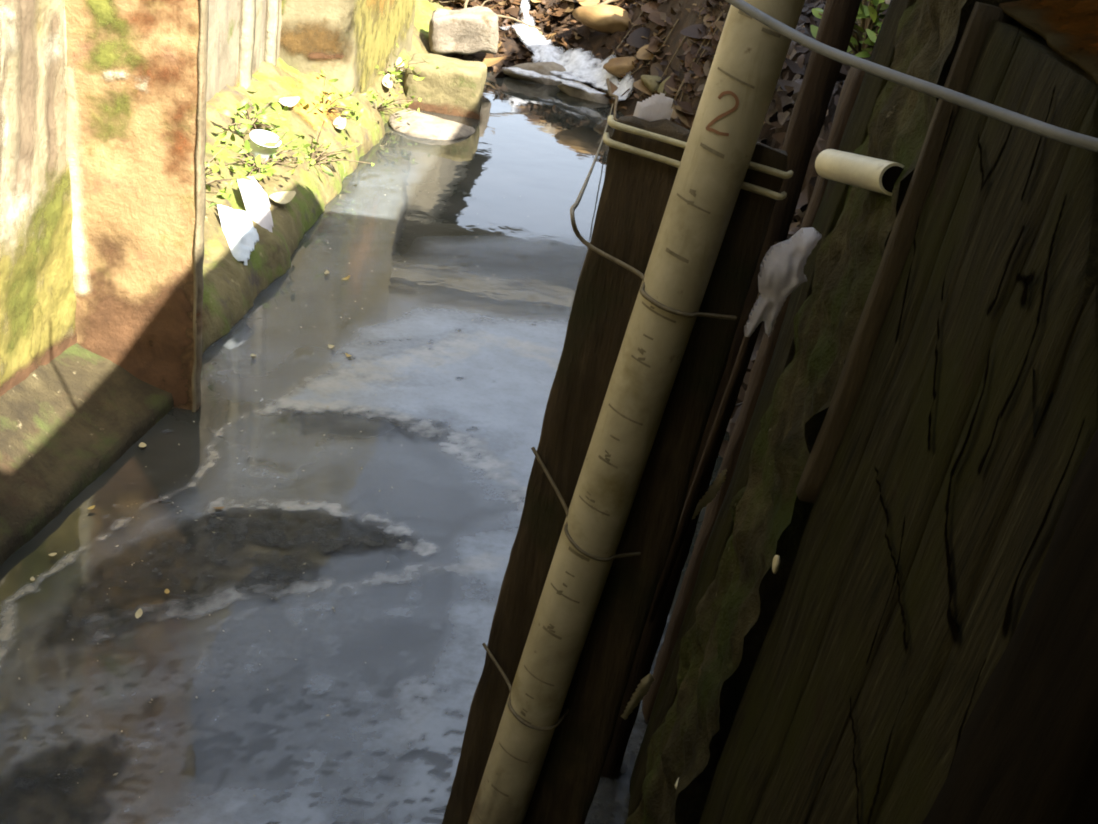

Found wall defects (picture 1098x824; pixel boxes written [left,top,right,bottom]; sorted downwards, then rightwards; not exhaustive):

leakage [0,0,203,411]
crack [927,246,955,451]
crack [944,86,1067,643]
crack [866,467,908,664]
crack [1002,419,1085,638]
crack [849,690,908,824]